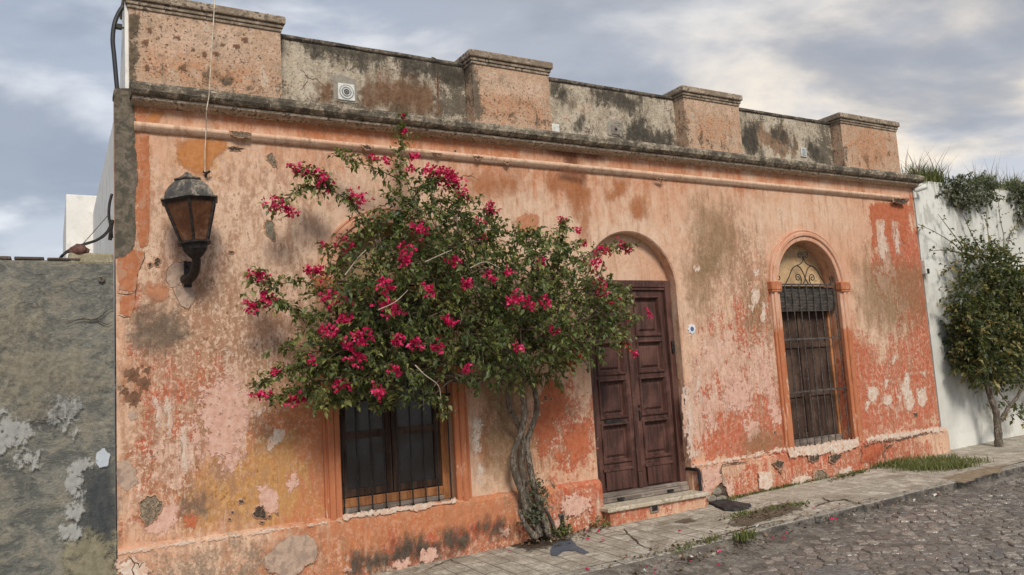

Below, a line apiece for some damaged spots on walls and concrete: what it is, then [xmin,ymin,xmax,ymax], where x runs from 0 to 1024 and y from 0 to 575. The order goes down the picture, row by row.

water stain [311,44,465,115]
water stain [551,82,567,105]
water stain [591,88,672,145]
peeling [176,137,245,174]
peeling [117,108,193,317]
peeling [118,364,266,474]
peeling [267,427,286,451]
peeling [469,415,486,486]
peeling [681,354,945,504]
flaking render [58,448,463,575]